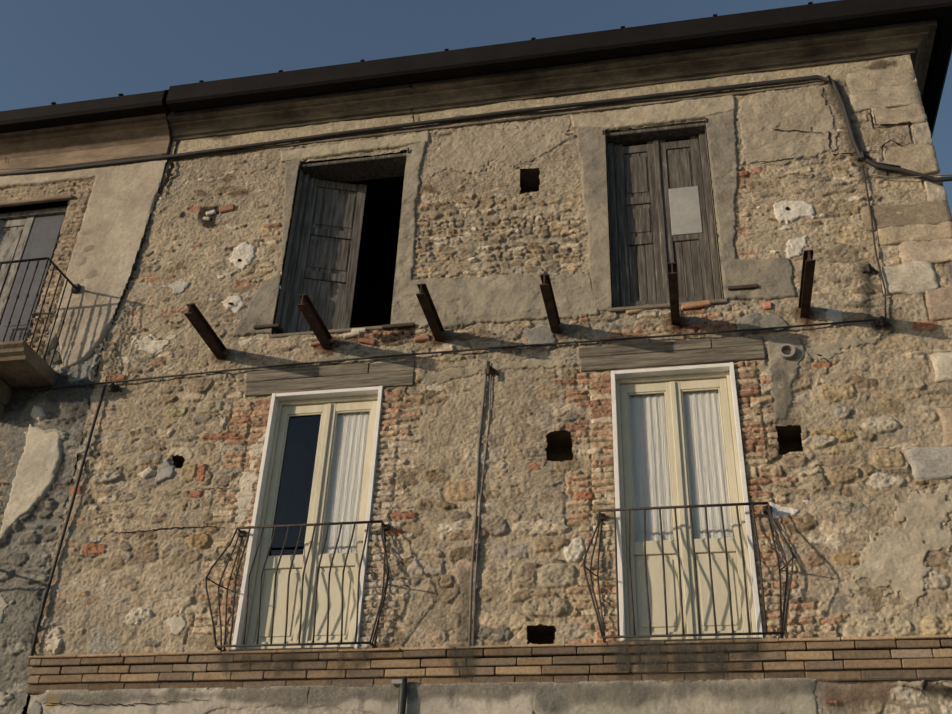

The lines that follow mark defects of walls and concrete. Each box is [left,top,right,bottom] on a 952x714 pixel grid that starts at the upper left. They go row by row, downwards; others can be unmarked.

crack [740,109,912,165]
crack [158,140,179,198]
spalling [61,354,100,384]